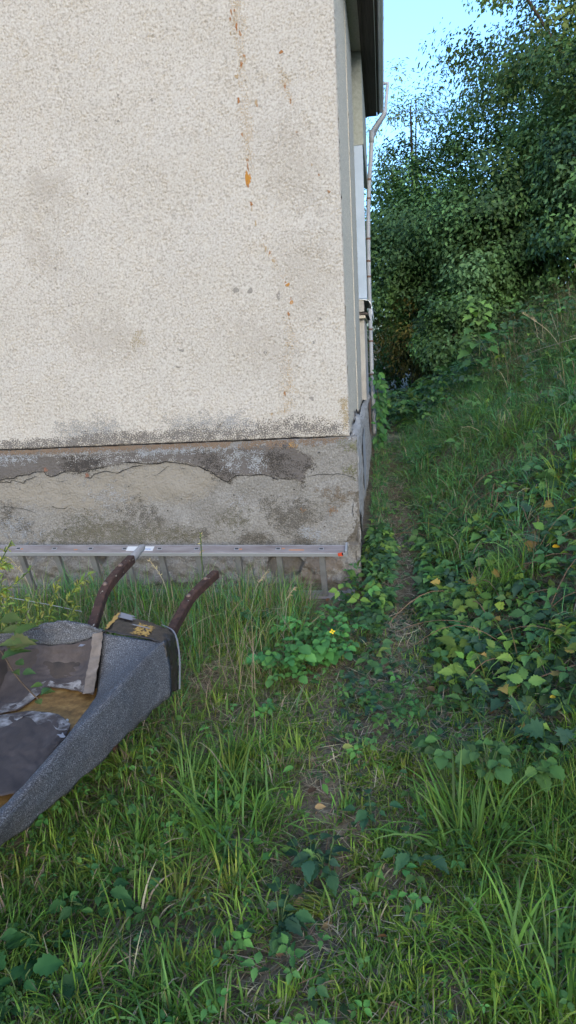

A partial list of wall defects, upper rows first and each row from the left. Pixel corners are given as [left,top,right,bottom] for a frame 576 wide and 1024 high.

rust [229,0,258,188]
crack [0,399,364,511]
damp [0,397,366,545]